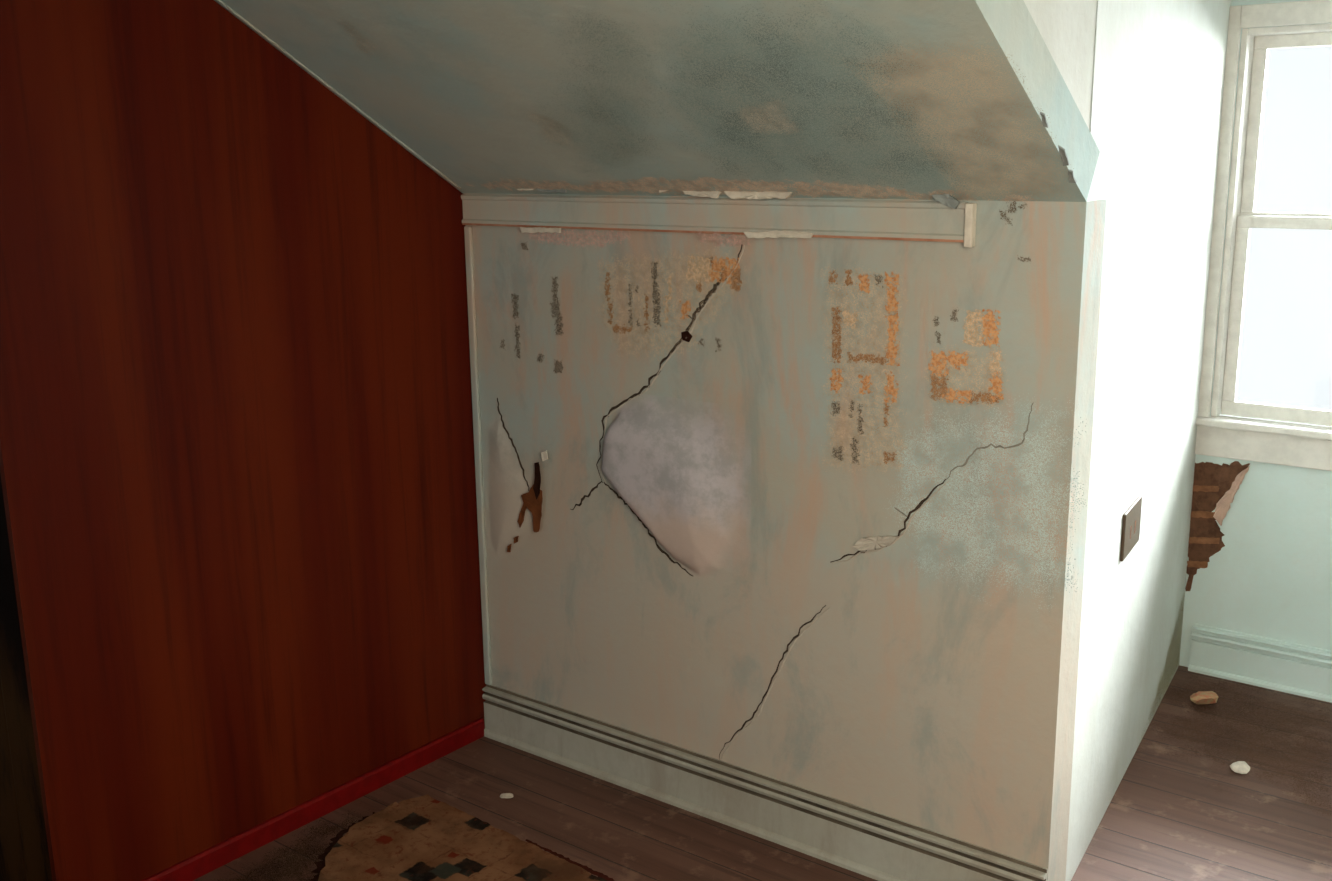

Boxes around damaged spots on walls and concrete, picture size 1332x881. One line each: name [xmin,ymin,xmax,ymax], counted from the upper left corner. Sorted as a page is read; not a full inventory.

crack [570,245,745,576]
crack [830,403,1033,564]
spalling [1185,461,1250,591]
crack [719,605,829,759]